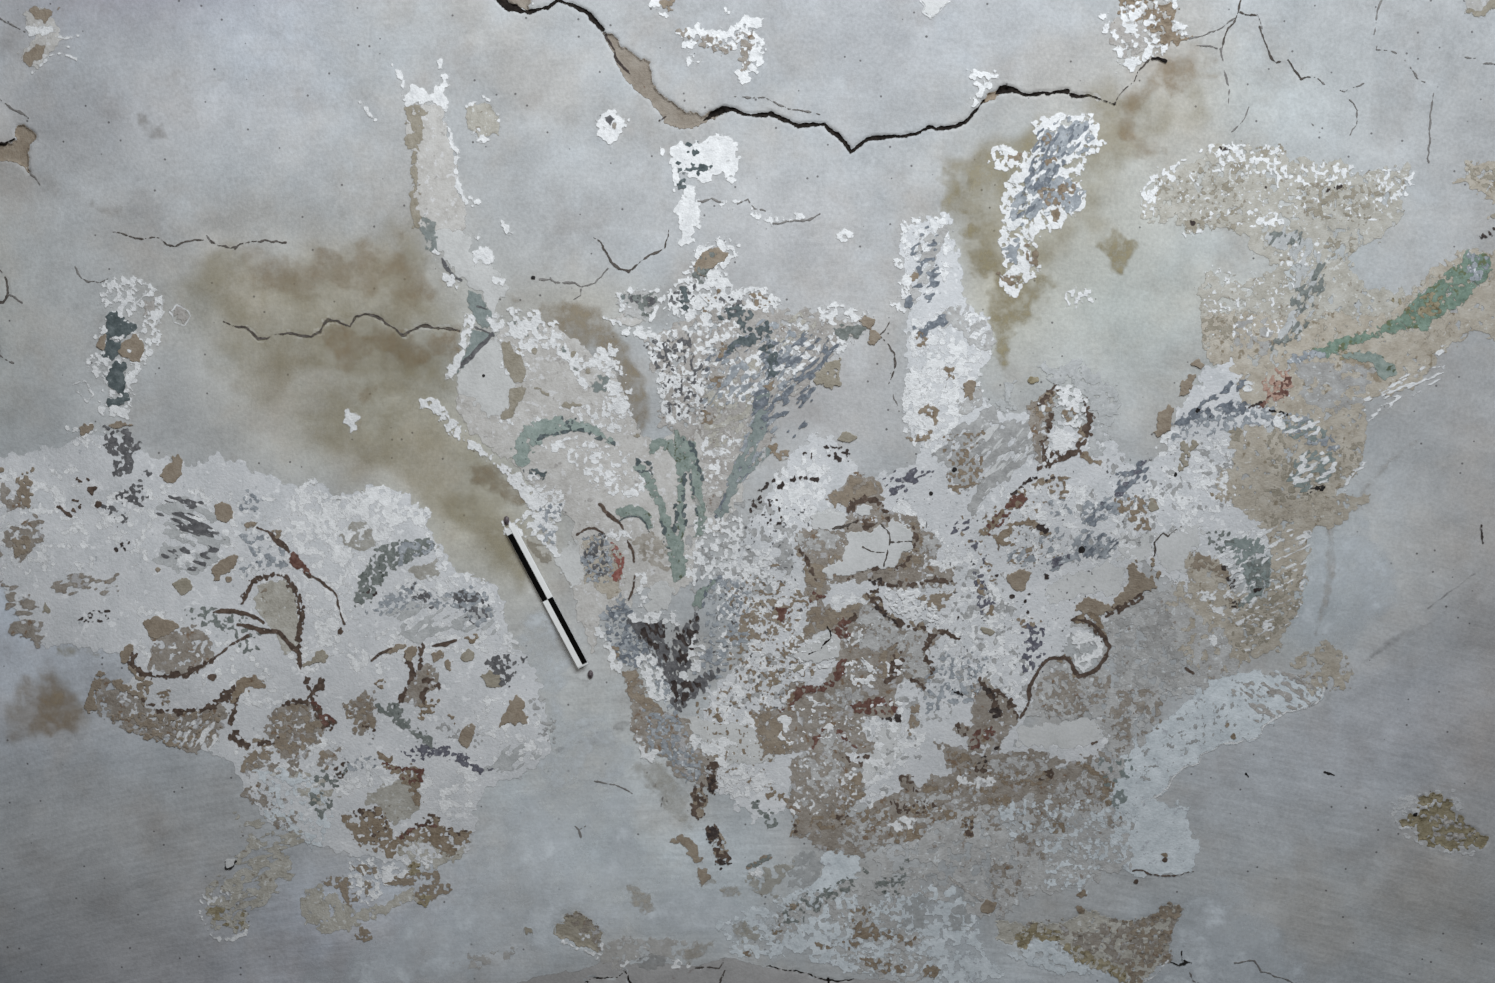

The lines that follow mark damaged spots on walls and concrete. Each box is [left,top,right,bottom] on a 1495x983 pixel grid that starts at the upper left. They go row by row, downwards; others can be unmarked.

spalling [17,6,79,74]
crack [497,0,630,74]
crack [703,0,1434,163]
spalling [0,124,37,173]
damp [947,135,1039,204]
damp [1100,237,1133,274]
peeling [65,275,191,449]
crack [223,313,460,340]
damp [965,225,1044,365]
flaking render [391,32,1495,983]
peeling [0,454,542,942]
crack [768,965,854,983]